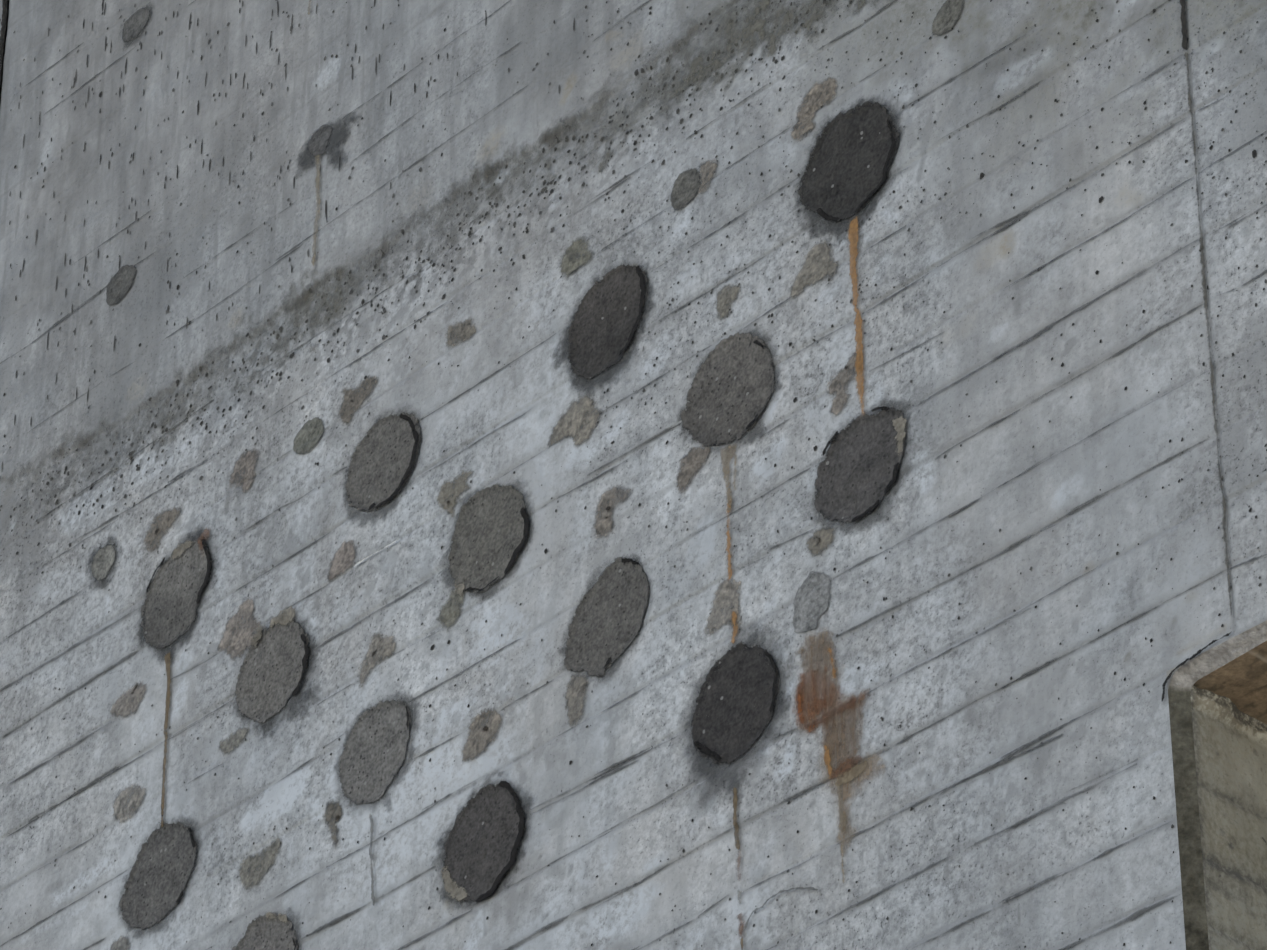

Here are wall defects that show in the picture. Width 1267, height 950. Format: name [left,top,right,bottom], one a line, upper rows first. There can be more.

leakage [641,0,833,101]
leakage [797,121,884,237]
leakage [555,275,652,393]
rust [848,216,864,414]
leakage [474,537,531,600]
rust [721,445,737,580]
leakage [818,477,902,531]
leakage [157,529,214,827]
leakage [237,707,276,736]
leakage [286,635,314,715]
rust [796,632,884,883]